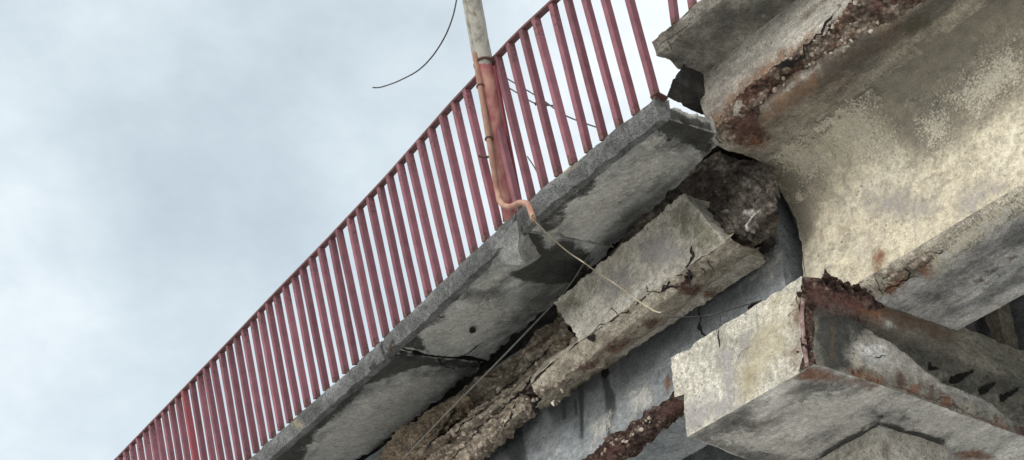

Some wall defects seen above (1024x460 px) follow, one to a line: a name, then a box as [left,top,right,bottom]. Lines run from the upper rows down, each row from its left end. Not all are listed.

crack [752,10,837,83]
spalling [714,0,926,202]
peeling [914,30,1024,154]
damp [500,109,714,317]
crack [596,246,715,331]
crack [386,343,490,370]
crack [425,340,554,460]
spalling [447,379,576,460]
damp [499,244,781,460]